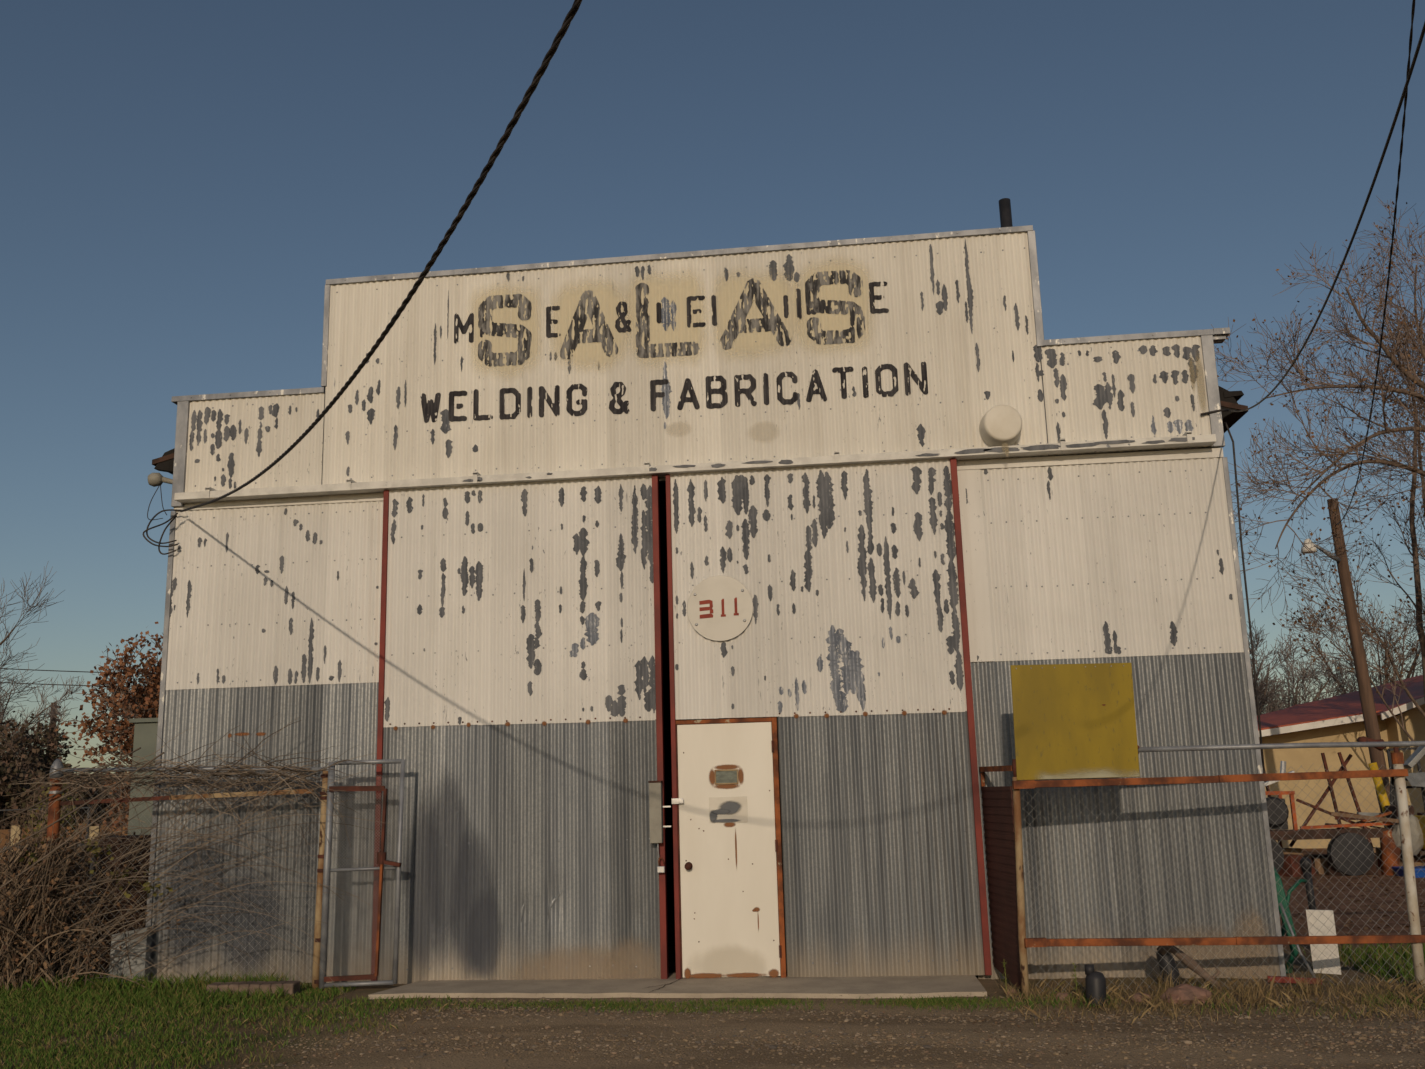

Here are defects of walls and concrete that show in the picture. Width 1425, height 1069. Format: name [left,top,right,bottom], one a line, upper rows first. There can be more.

peeling [769,254,800,282]
peeling [920,240,980,372]
peeling [189,403,297,489]
peeling [348,353,407,450]
peeling [430,409,453,458]
peeling [390,494,425,544]
peeling [442,477,483,534]
peeling [521,295,1200,696]
peeling [255,556,342,684]
peeling [417,556,483,618]
peeling [582,655,656,717]
peeling [764,625,880,713]